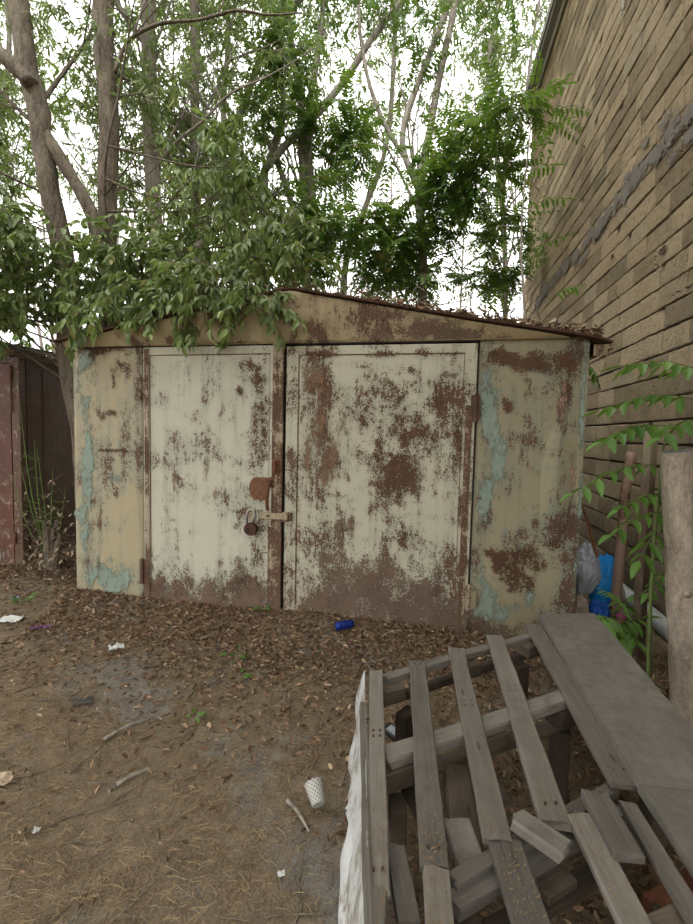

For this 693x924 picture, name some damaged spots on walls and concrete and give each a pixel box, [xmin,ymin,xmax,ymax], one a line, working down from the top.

corrosion [74,347,143,389]
corrosion [217,340,271,474]
corrosion [281,310,584,638]
corrosion [227,486,250,542]
corrosion [145,556,268,609]